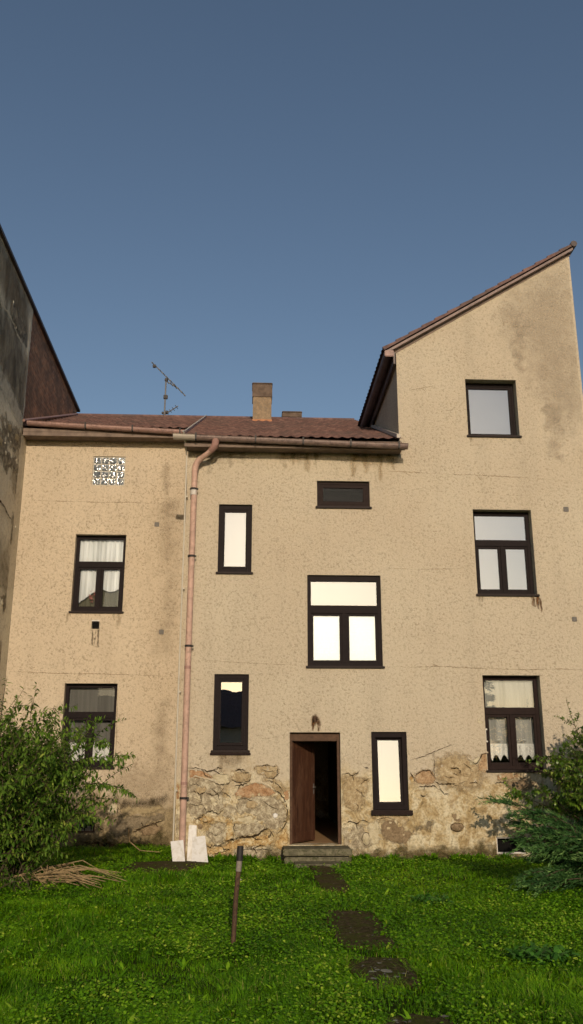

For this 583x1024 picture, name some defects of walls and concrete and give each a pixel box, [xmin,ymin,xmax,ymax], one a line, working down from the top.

damp [0,241,27,430]
flaking render [0,412,22,476]
flaking render [108,803,164,839]
flaking render [172,764,290,858]
flaking render [341,767,414,852]
flaking render [409,751,538,792]